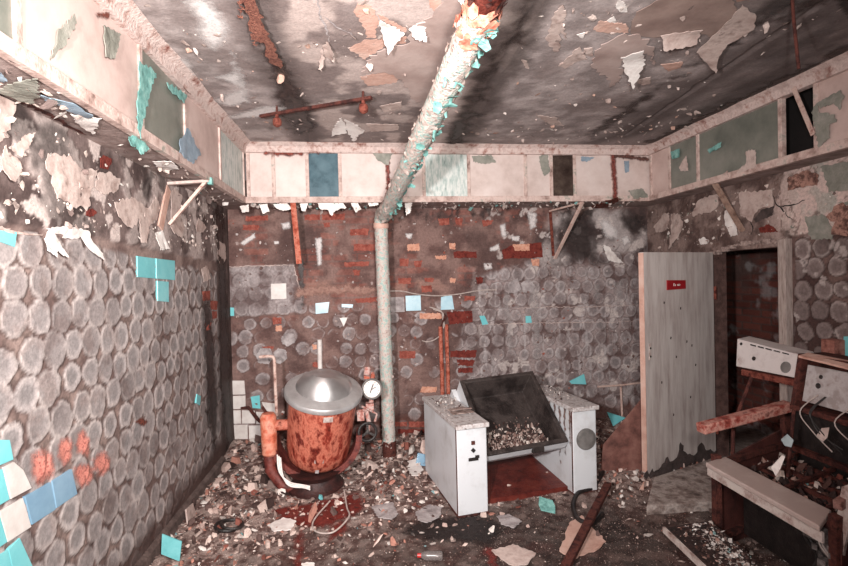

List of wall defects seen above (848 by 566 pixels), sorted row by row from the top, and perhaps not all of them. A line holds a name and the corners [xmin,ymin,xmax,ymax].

peeling [103,25,121,59]
peeling [350,0,465,112]
peeling [558,0,756,89]
peeling [0,73,102,182]
peeling [128,61,156,155]
peeling [332,117,399,141]
peeling [787,161,848,192]
peeling [45,153,185,251]
peeling [240,203,379,231]
peeling [689,190,778,236]
peeling [44,226,105,260]
flaking render [502,242,543,266]